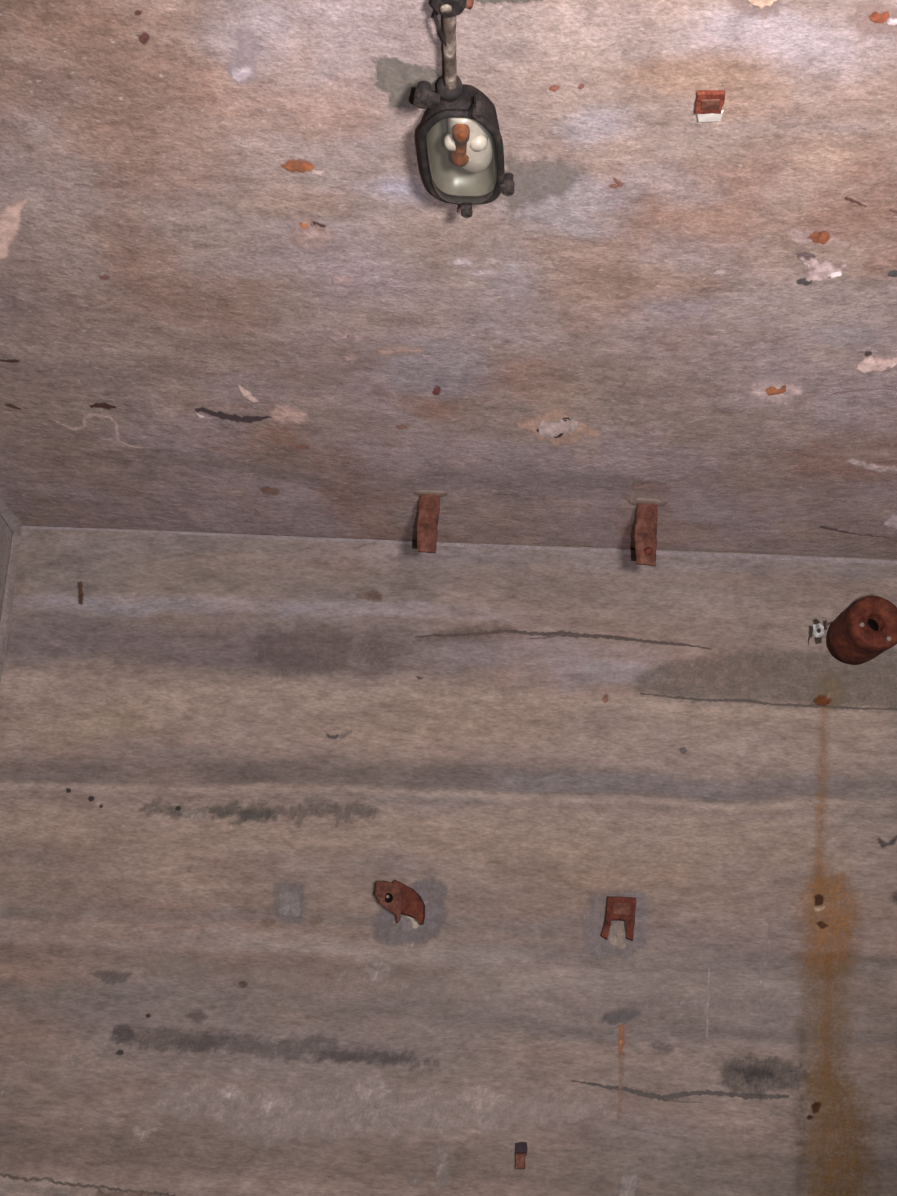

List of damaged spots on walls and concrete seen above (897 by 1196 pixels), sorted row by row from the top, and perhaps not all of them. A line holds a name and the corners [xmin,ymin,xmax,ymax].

water stain [377,57,439,108]
spalling [797,252,847,286]
crack [416,627,711,649]
rust [814,680,841,706]
water stain [143,801,371,824]
rust [807,852,852,991]
water stain [114,1012,428,1067]
crack [571,1080,789,1103]
crack [0,1174,175,1196]